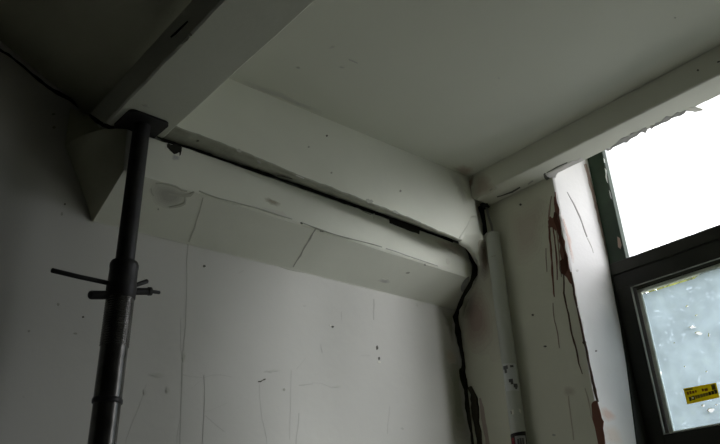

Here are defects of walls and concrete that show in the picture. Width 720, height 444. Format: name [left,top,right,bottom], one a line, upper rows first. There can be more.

crack [0,49,115,129]
crack [157,136,390,219]
crack [151,182,438,272]
rust [546,192,574,297]
rust [584,164,608,256]
spalling [603,107,703,197]
crack [176,288,187,444]
crack [419,228,482,444]
rust [585,389,605,444]